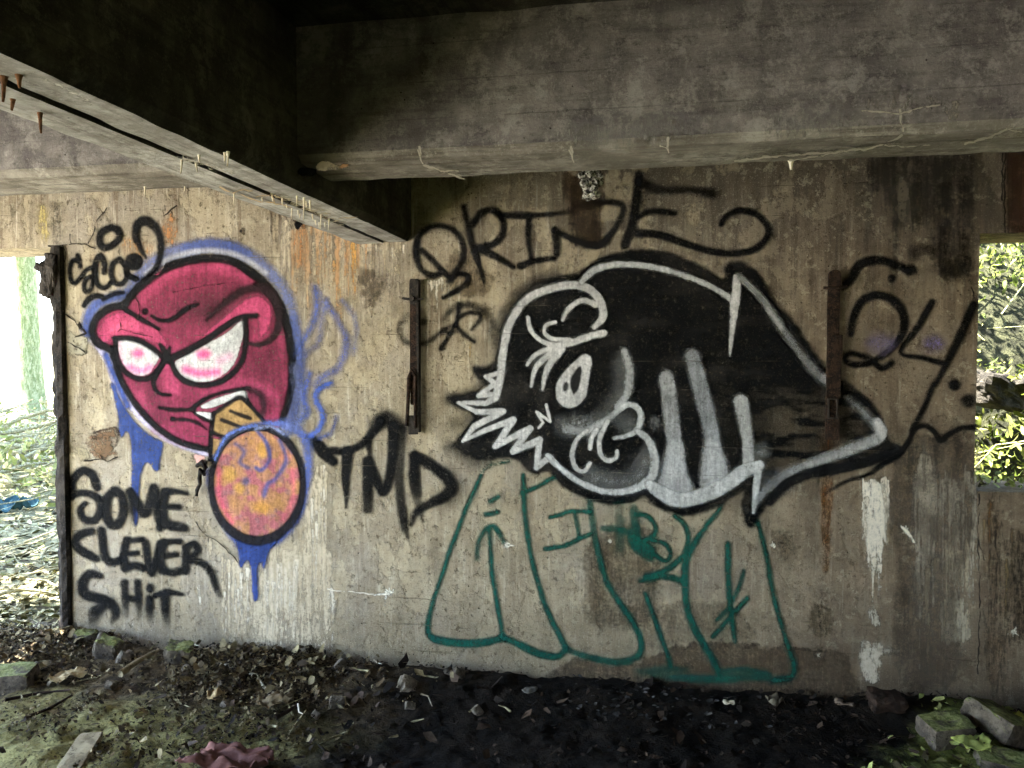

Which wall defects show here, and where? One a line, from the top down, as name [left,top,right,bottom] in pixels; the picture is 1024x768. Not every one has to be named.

crack [734,104,940,162]
crack [48,207,107,262]
crack [219,186,291,208]
damp [867,142,975,278]
spalling [75,426,119,461]
rust [821,475,833,571]
damp [546,432,979,699]